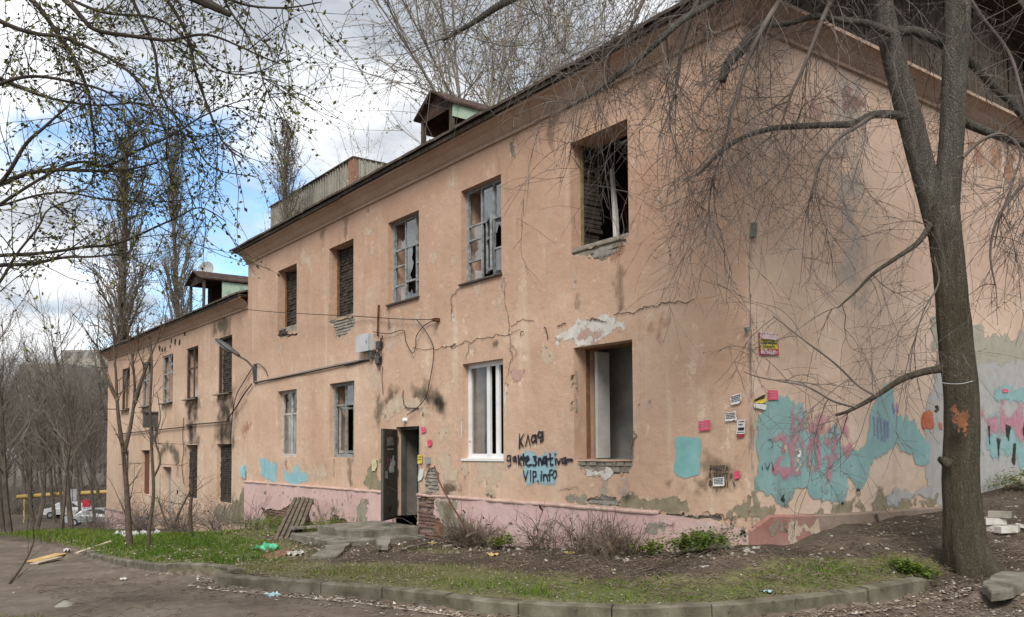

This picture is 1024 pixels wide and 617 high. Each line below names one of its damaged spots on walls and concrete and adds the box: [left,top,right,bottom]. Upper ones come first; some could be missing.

spalling [572,233,629,261]
spalling [329,313,355,338]
crack [413,279,695,377]
peeling [541,313,626,365]
leakage [415,389,443,410]
spalling [417,424,507,542]
spalling [578,459,634,480]
peeling [565,491,748,551]
peeling [769,519,820,544]